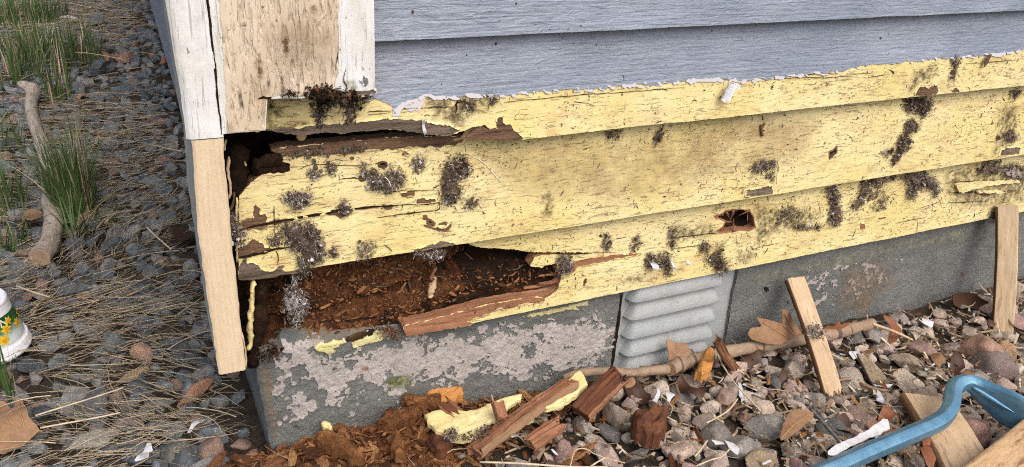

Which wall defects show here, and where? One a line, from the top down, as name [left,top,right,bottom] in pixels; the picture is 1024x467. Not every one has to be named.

crack [207,0,222,135]
leakage [949,165,1022,203]
peeling [238,205,355,281]
leakage [758,209,813,239]
peeling [271,297,616,435]